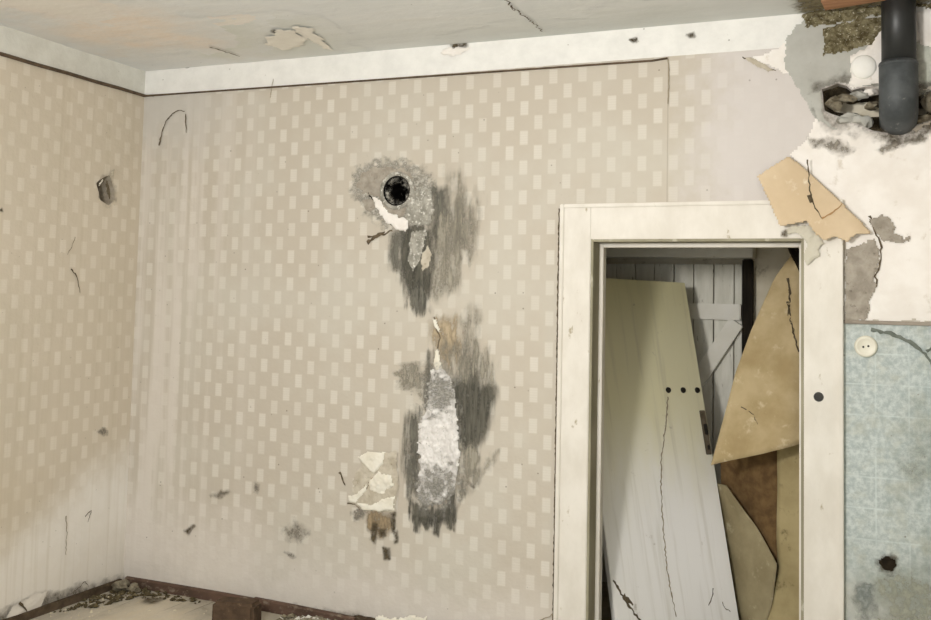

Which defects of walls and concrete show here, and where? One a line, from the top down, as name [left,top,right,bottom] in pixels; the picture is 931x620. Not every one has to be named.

peeling [253,10,372,59]
flaking render [746,20,931,139]
spalling [352,159,435,245]
peeling [421,246,432,271]
peeling [781,225,824,265]
crack [868,215,883,287]
flaking render [845,214,910,320]
crack [871,327,931,364]
leakage [0,432,63,574]
peeling [348,451,397,512]
leakage [844,567,931,620]